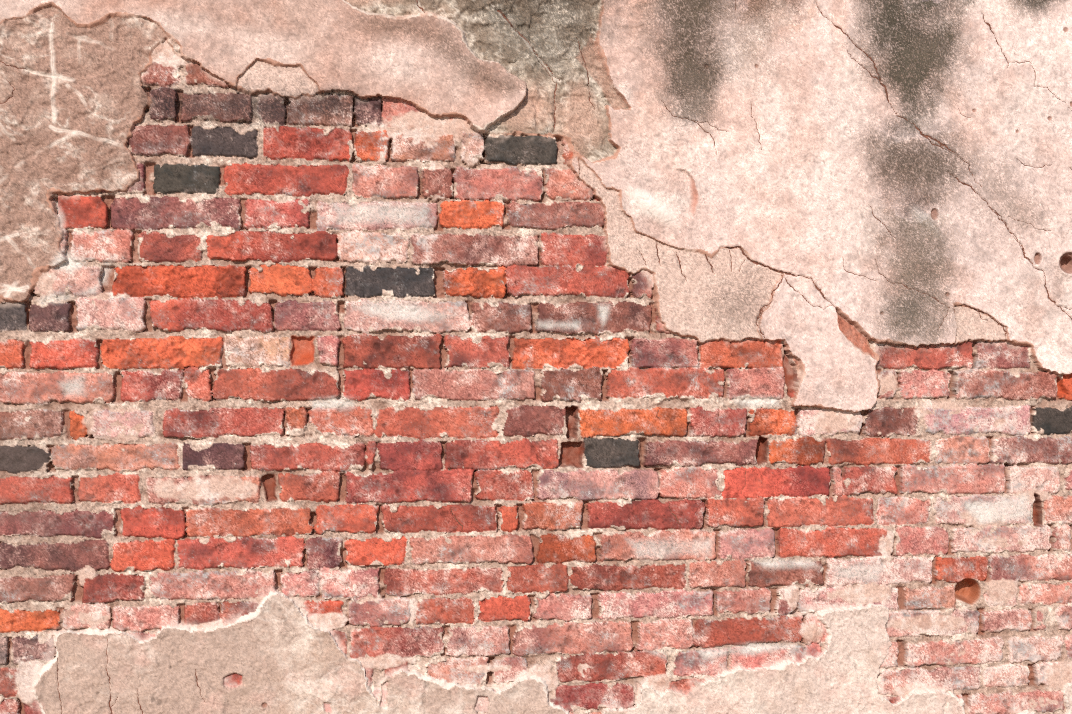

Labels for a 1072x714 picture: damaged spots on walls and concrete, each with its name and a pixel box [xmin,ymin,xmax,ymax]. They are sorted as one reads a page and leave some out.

damp [662,0,719,112]
damp [868,0,955,125]
spalling [0,0,844,441]
crack [664,103,727,154]
crack [637,243,838,338]
damp [881,144,955,185]
damp [894,217,942,327]
crack [843,258,1007,337]
crack [816,2,1072,319]
spalling [835,292,1072,410]
spalling [0,590,331,714]
spalling [404,671,570,714]